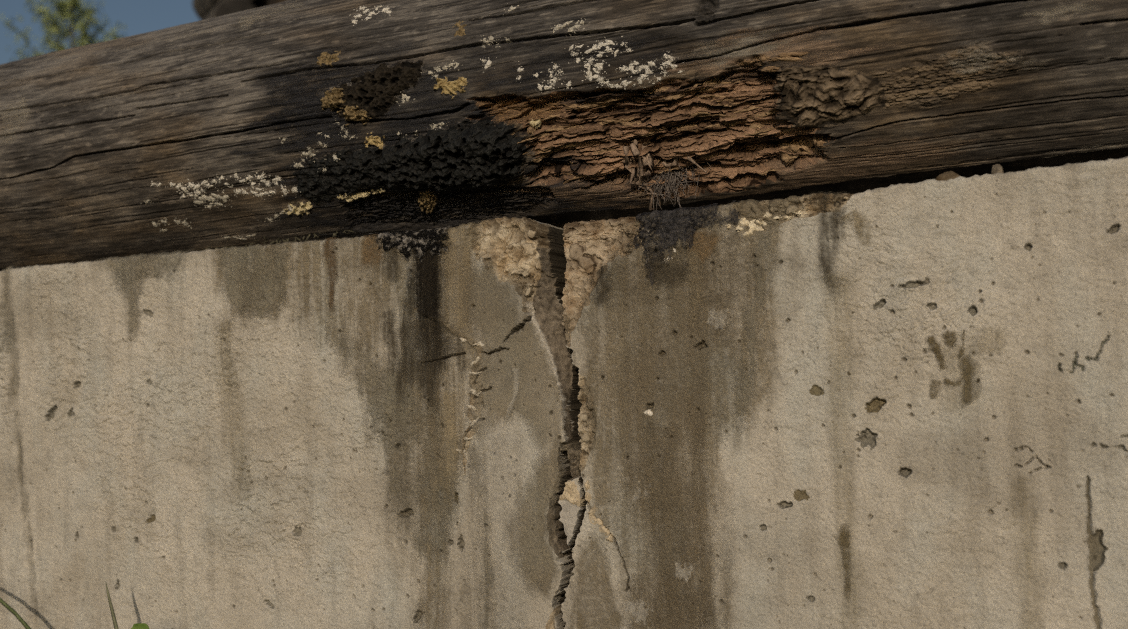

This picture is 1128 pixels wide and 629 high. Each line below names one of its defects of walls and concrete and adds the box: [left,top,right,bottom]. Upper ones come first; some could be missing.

damp [105,251,180,332]
damp [215,224,568,629]
spalling [468,216,644,347]
crack [521,227,630,629]
damp [571,196,807,629]
damp [821,191,869,283]
crack [1058,336,1109,373]
crack [1092,436,1128,452]
damp [839,528,850,591]
crack [1086,476,1109,629]